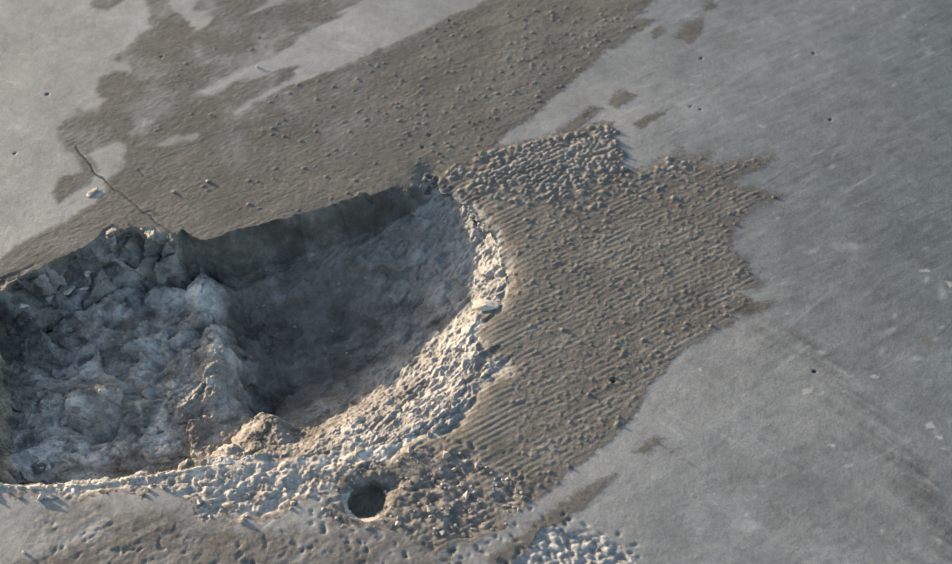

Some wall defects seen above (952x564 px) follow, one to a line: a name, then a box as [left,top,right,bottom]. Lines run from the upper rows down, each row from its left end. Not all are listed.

crack [77,147,176,235]
water stain [0,0,782,516]
spalling [0,170,526,564]
water stain [44,512,185,564]
water stain [192,530,485,564]
water stain [488,473,616,564]
spalling [499,525,636,564]
water stain [673,485,768,564]